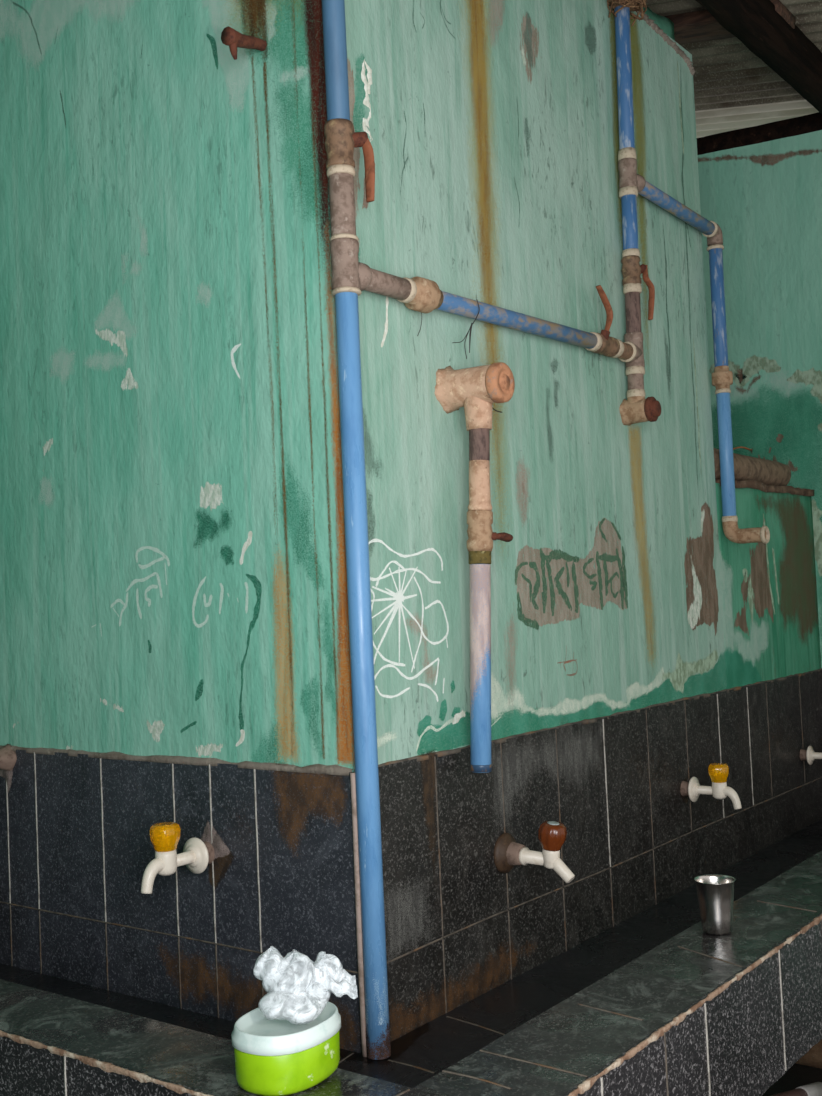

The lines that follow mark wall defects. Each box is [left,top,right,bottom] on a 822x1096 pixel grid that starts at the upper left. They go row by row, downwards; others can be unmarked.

rust [457,0,504,306]
rust [219,0,355,859]
rust [490,401,515,556]
peeling [515,518,627,627]
rust [627,423,659,667]
peeling [684,502,779,667]
water stain [384,876,439,971]
water stain [389,938,538,1041]